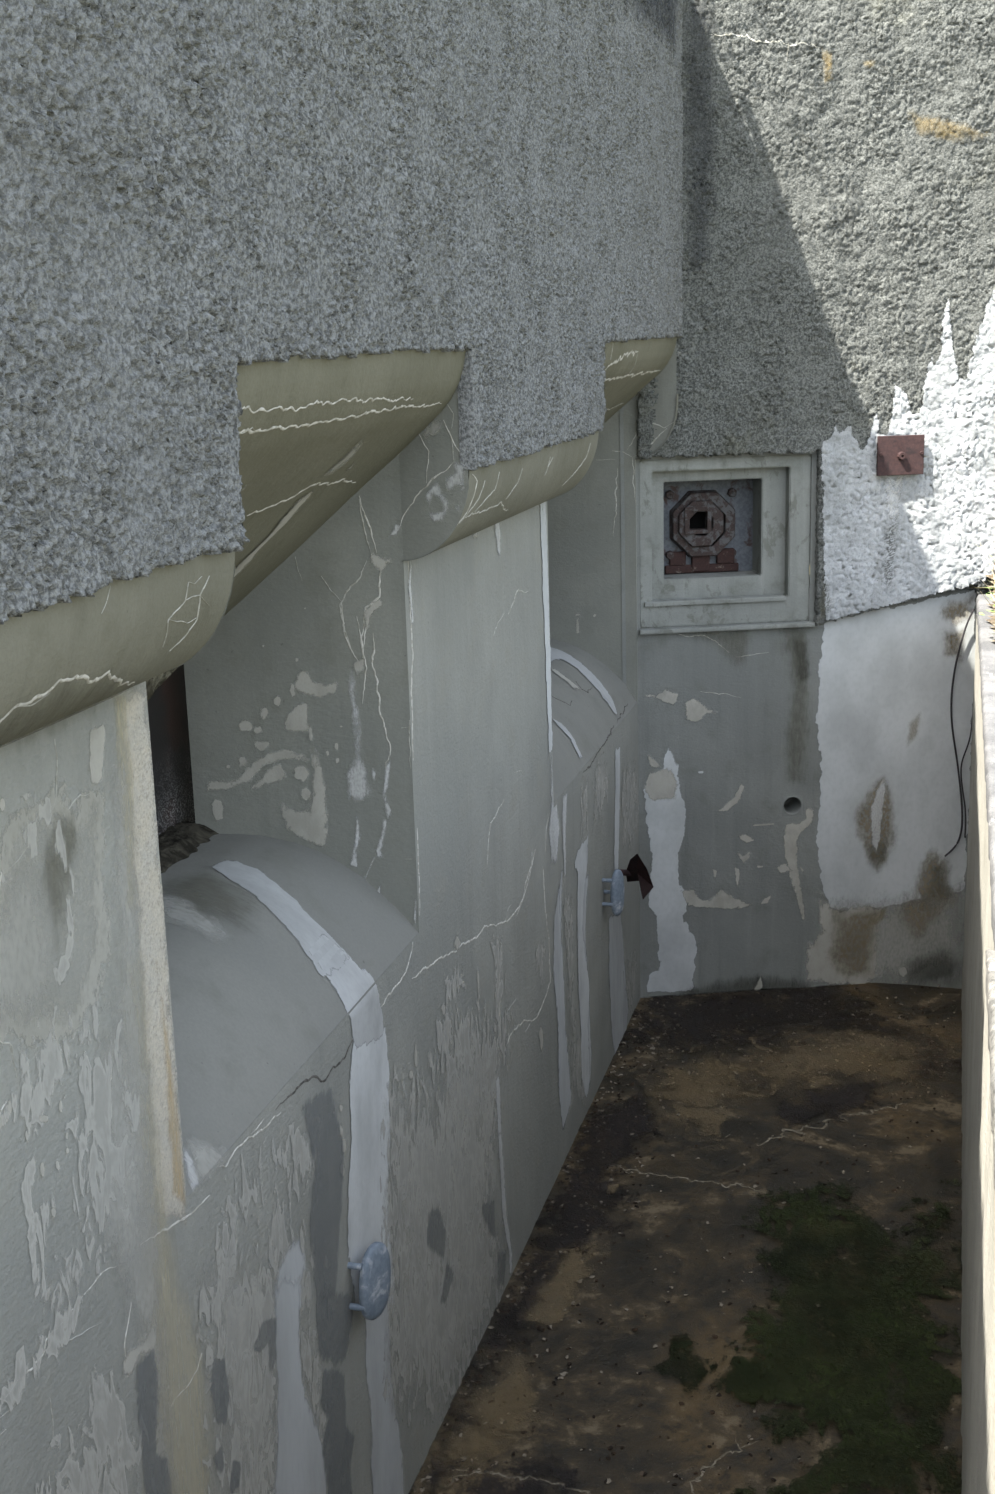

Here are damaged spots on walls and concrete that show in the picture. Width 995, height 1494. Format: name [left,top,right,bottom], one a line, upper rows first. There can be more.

crack [239,397,442,434]
crack [457,346,672,531]
crack [0,670,135,723]
crack [163,576,210,651]
peeling [207,658,342,846]
crack [247,478,433,766]
crack [585,704,628,771]
damp [687,809,958,995]
crack [0,1038,354,1440]
damp [254,1090,354,1494]
damp [211,1360,229,1423]
damp [214,1447,240,1492]